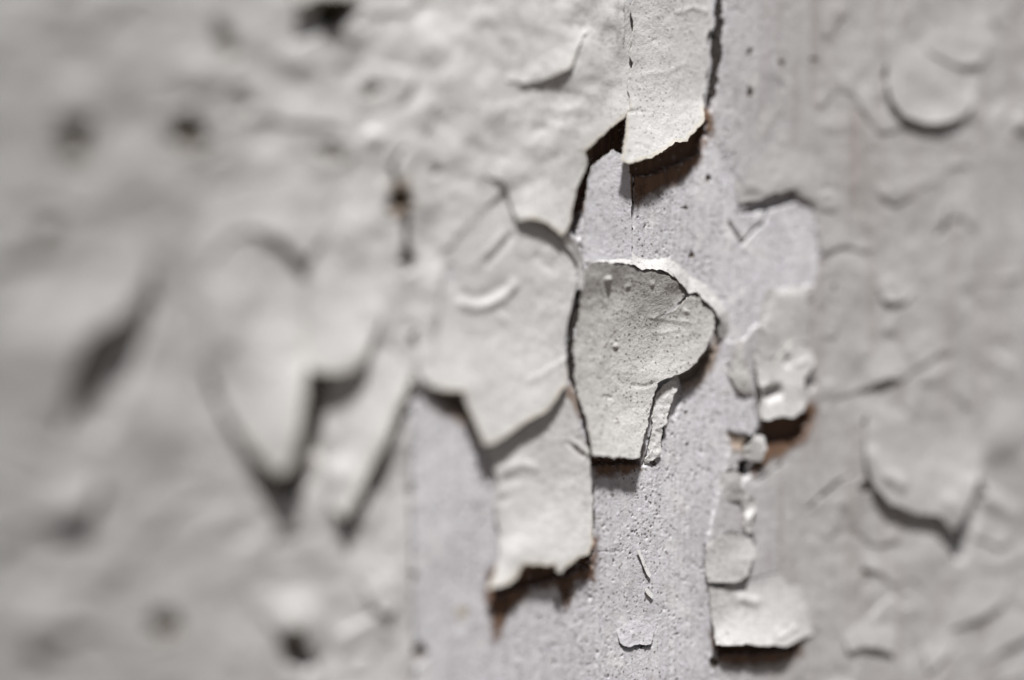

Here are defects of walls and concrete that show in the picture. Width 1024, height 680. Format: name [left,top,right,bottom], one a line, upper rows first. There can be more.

peeling [734,144,822,204]
peeling [178,0,715,589]
peeling [725,285,815,421]
peeling [743,434,767,462]
peeling [617,601,656,647]
peeling [705,471,817,647]